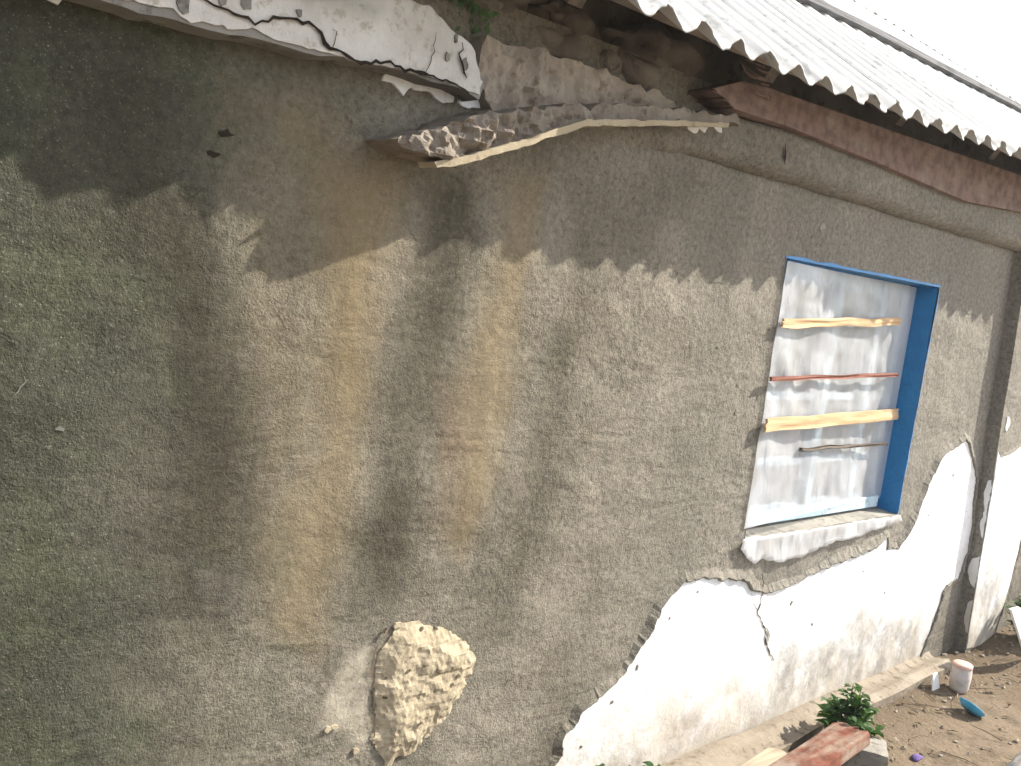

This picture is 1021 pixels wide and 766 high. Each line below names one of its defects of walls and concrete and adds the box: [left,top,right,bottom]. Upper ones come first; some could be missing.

crack [205,0,469,94]
peeling [125,0,676,111]
crack [752,575,774,660]
peeling [542,433,1021,766]